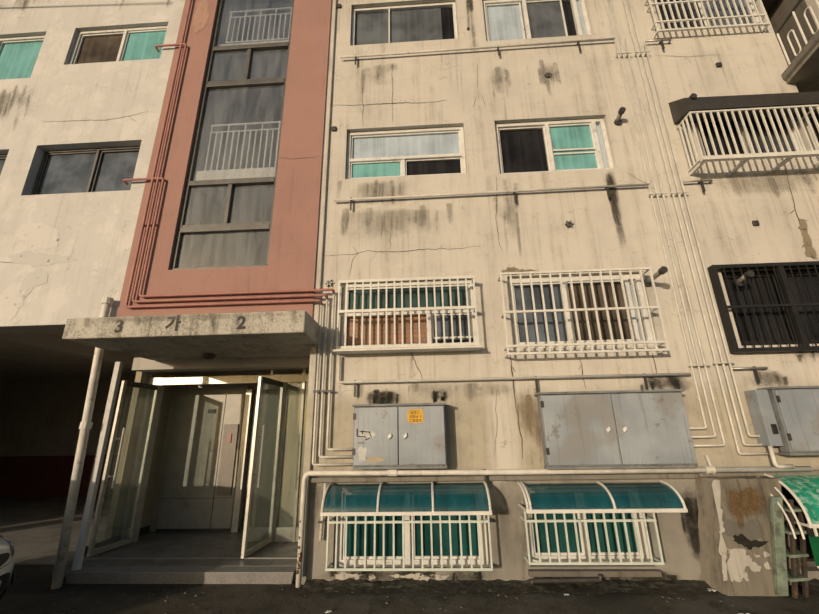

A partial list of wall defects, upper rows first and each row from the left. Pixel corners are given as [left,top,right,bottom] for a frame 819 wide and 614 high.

peeling [192,0,210,33]
damp [607,175,622,234]
crack [785,169,808,221]
crack [330,234,476,277]
crack [494,356,523,459]
peeling [712,480,771,582]
rust [730,488,764,527]